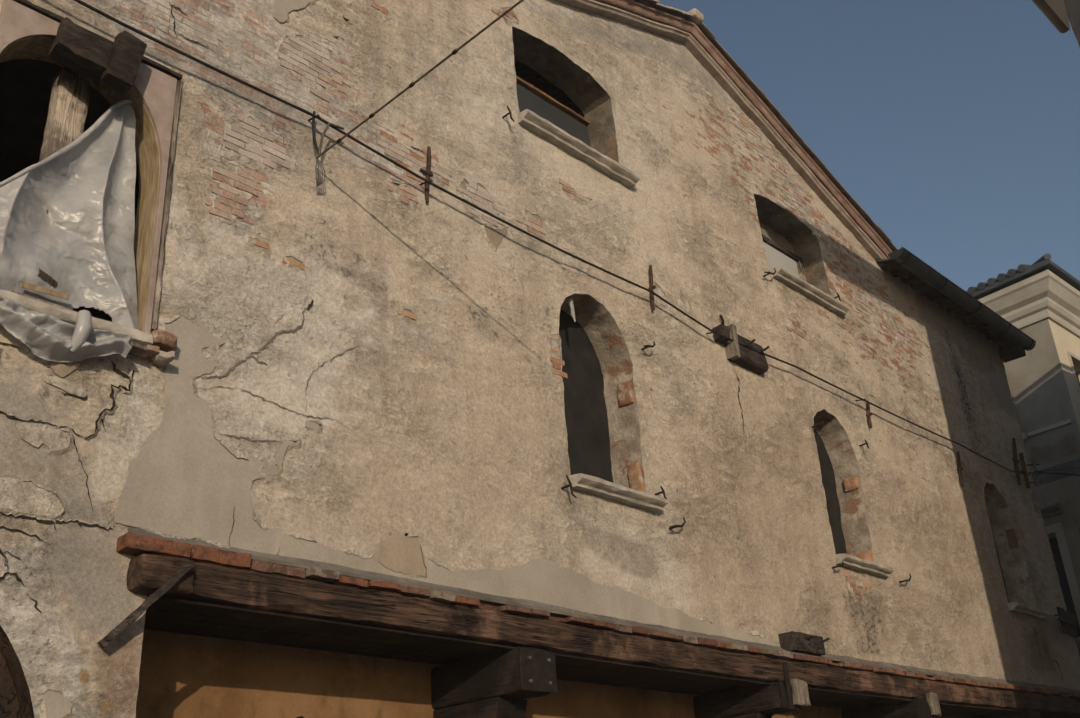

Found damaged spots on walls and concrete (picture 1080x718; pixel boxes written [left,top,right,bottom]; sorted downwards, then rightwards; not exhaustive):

flaking render [205,113,290,224]
flaking render [243,234,305,271]
flaking render [377,130,546,251]
flaking render [730,106,912,345]
crack [0,342,21,363]
crack [200,300,361,430]
crack [0,360,135,612]
flaking render [115,315,777,646]